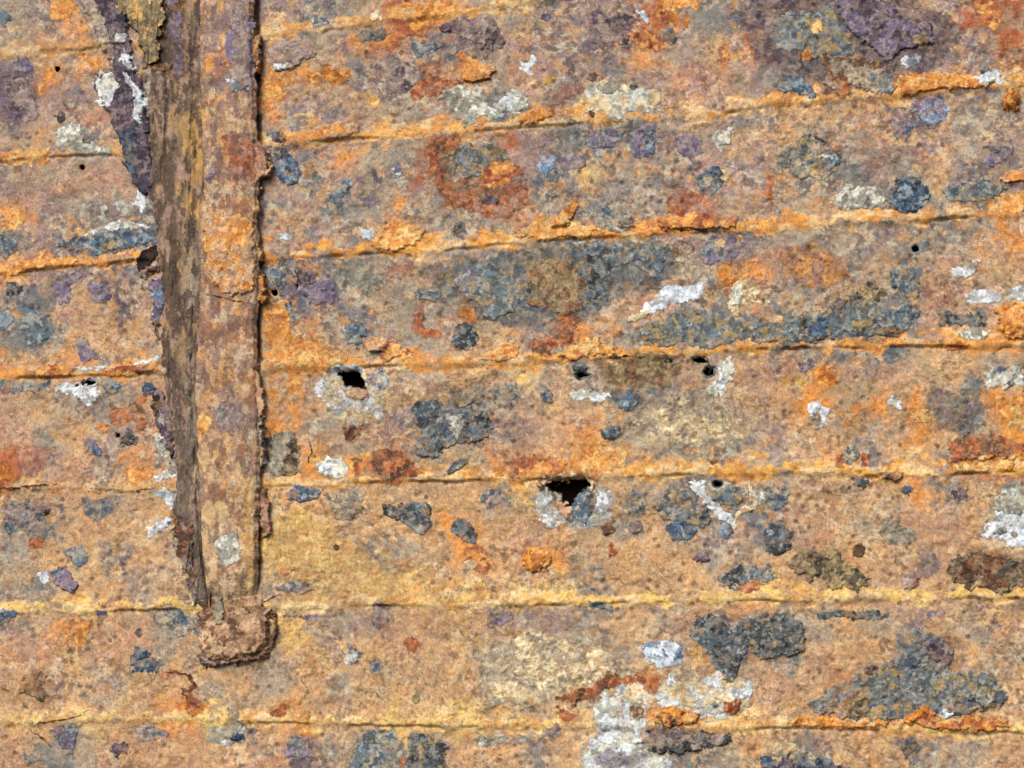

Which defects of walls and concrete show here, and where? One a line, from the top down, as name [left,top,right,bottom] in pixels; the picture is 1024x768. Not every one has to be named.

peeling [91,32,148,124]
corrosion [115,0,187,81]
corrosion [898,71,988,97]
corrosion [425,132,605,242]
corrosion [200,213,353,470]
corrosion [480,258,683,390]
corrosion [352,448,423,486]
corrosion [494,439,629,486]
corrosion [947,392,1024,474]
corrosion [36,545,89,593]
corrosion [786,547,872,594]
corrosion [946,551,1024,596]